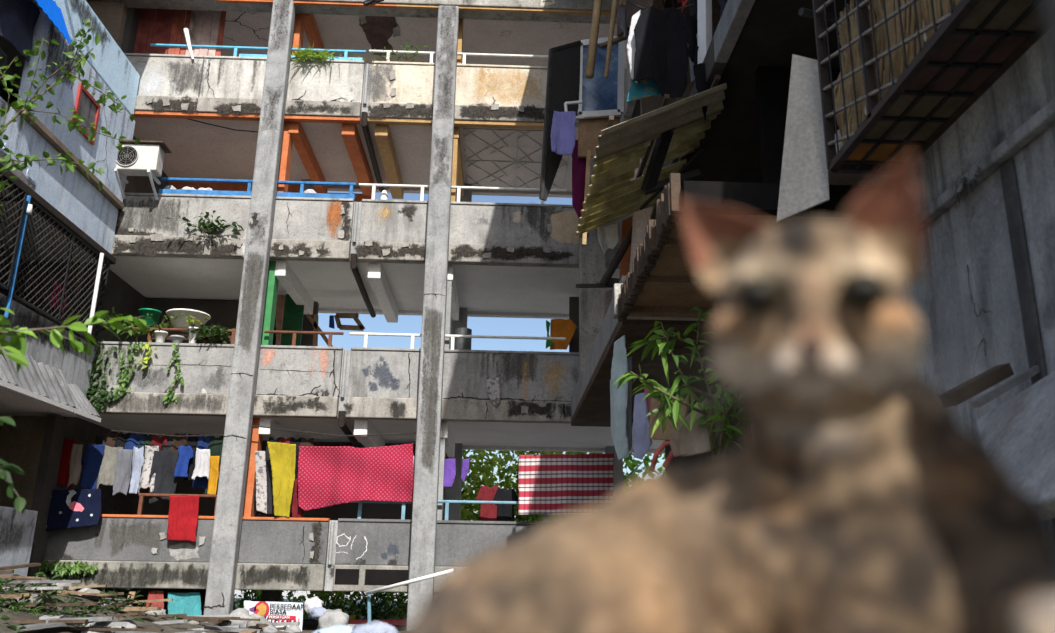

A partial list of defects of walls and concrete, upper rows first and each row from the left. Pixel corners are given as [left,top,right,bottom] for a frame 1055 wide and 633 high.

crack [224,12,270,41]
leakage [368,65,394,101]
peeling [359,16,435,120]
leakage [267,91,351,121]
rust [327,201,341,237]
leakage [482,353,537,396]
leakage [240,566,307,587]